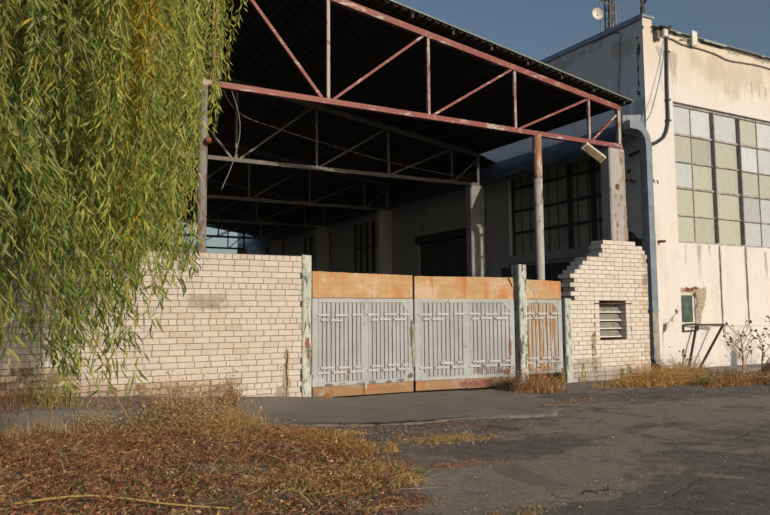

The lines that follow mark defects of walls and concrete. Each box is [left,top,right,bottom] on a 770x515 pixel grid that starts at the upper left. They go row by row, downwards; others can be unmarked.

flaking render [680,287,707,324]